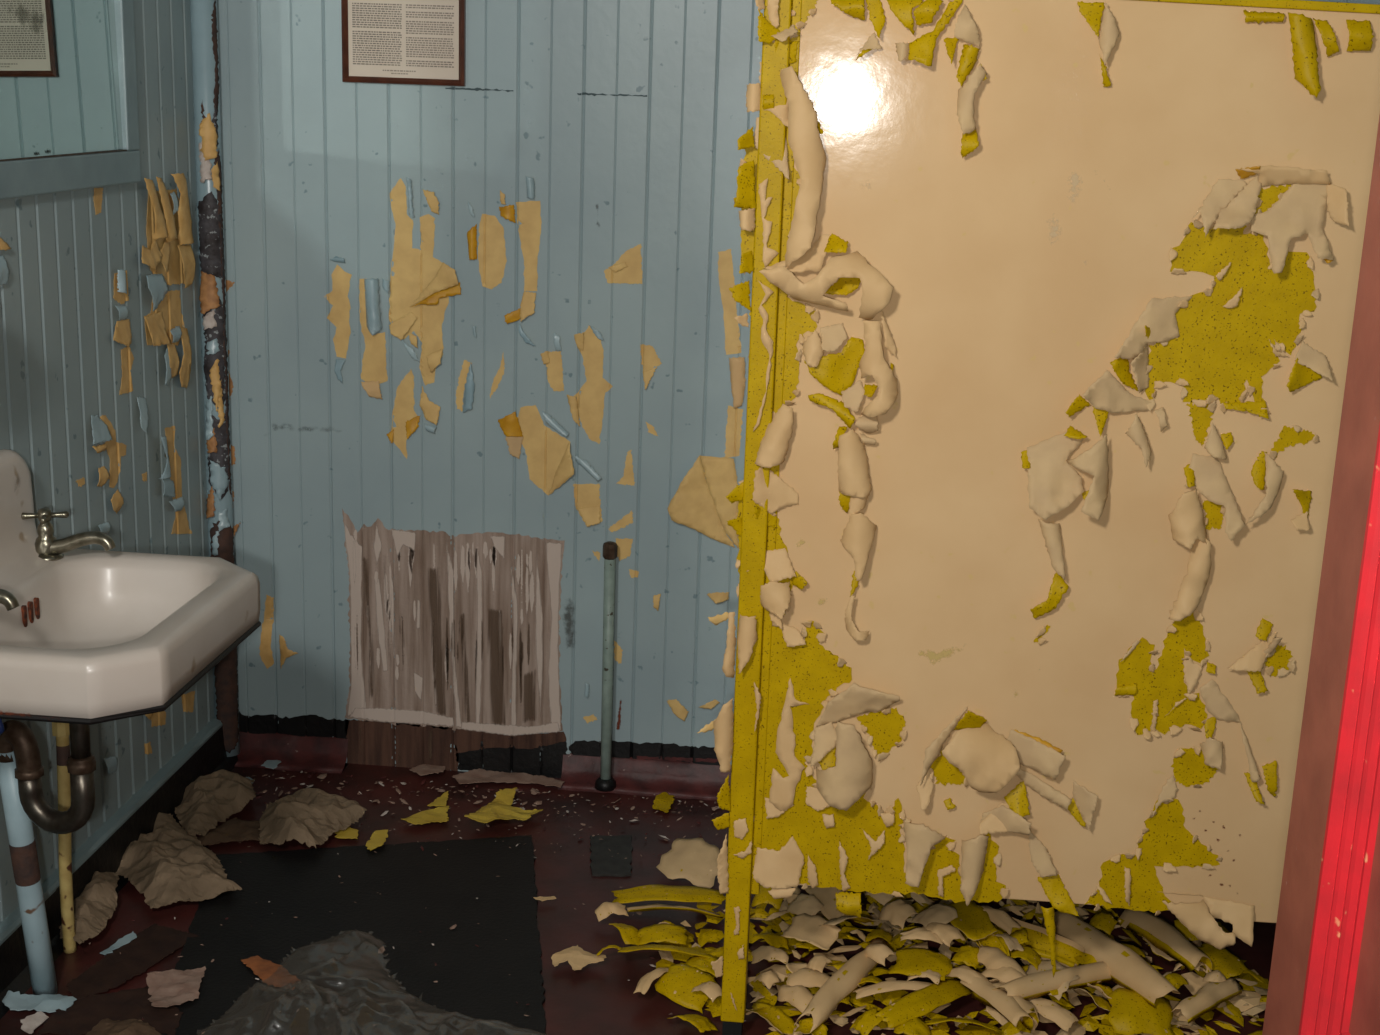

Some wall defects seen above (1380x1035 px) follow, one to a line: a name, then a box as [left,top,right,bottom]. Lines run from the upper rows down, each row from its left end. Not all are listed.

peeling [1243,10,1374,98]
peeling [94,187,103,214]
peeling [76,415,127,534]
peeling [113,0,240,556]
peeling [324,177,505,459]
peeling [342,509,567,771]
peeling [467,176,643,578]
peeling [637,0,1349,1035]
peeling [427,791,449,807]